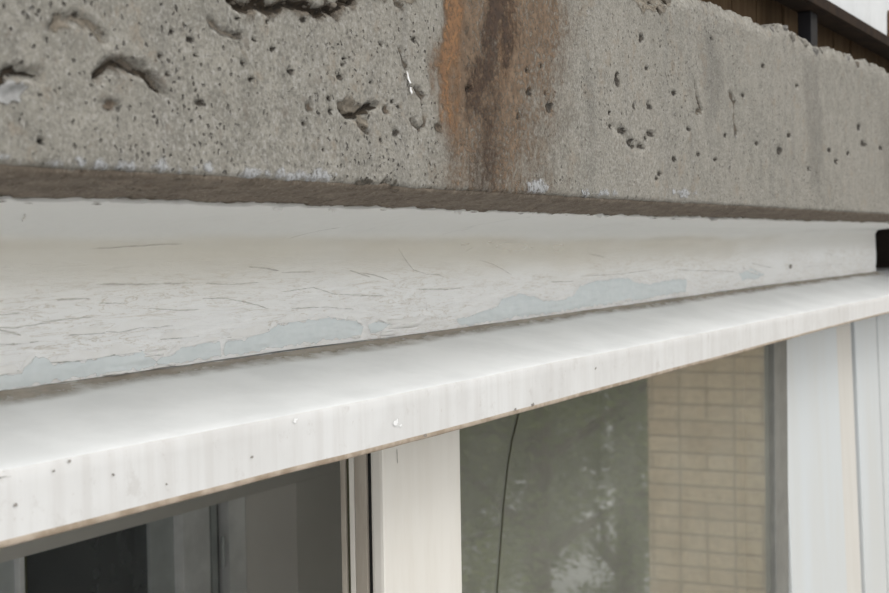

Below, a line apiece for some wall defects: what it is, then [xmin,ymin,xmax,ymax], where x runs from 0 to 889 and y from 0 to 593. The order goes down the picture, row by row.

crack [225,0,356,20]
spalling [634,0,671,15]
rust [433,0,569,194]
peeling [454,275,687,326]
peeling [0,313,363,391]